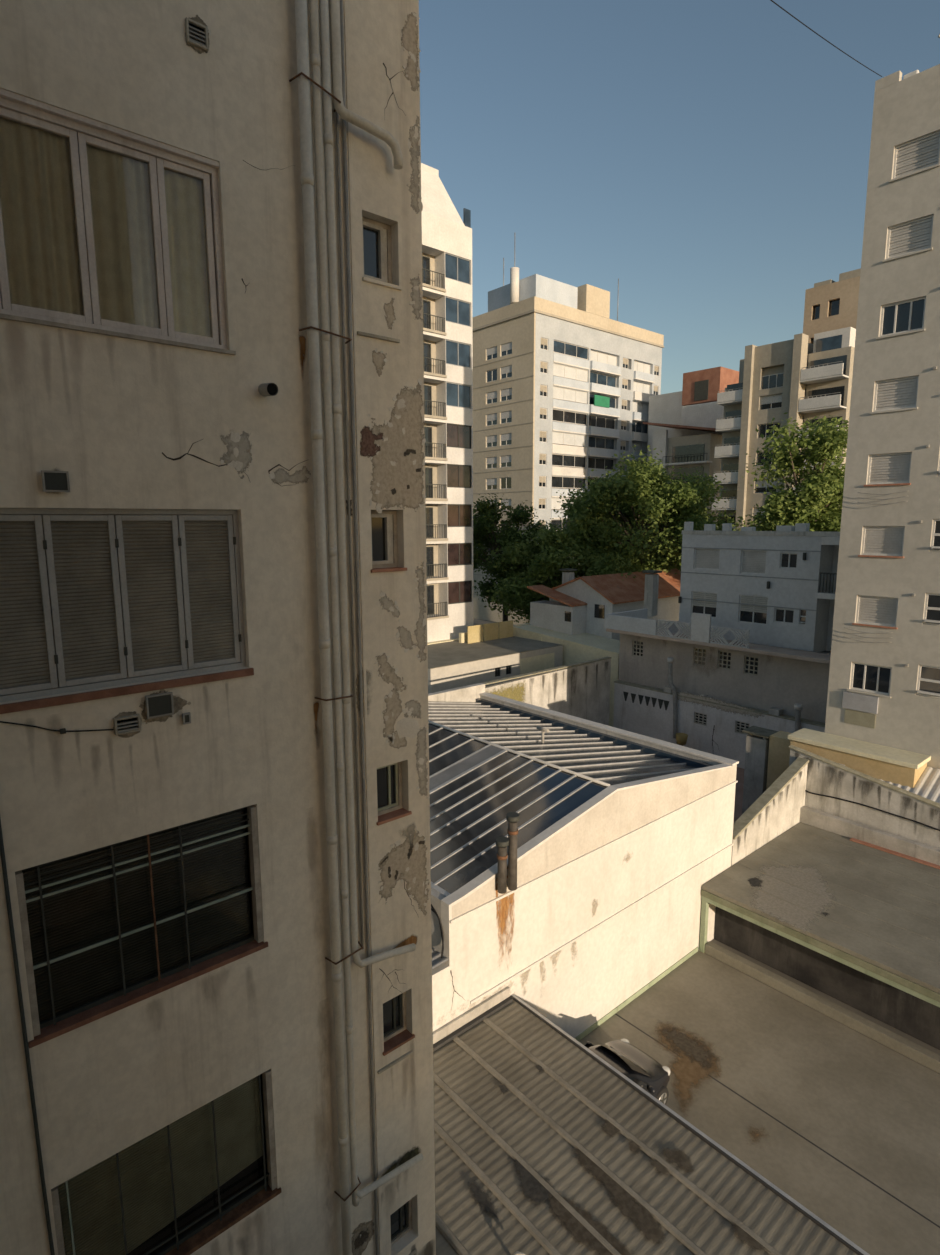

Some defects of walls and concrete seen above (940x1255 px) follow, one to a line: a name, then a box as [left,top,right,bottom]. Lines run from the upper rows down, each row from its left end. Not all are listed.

peeling [401,12,421,91]
crack [162,440,307,486]
spalling [360,378,426,513]
peeling [379,562,427,662]
peeling [375,653,430,799]
spalling [378,831,429,915]
rust [496,884,514,947]
leakage [515,1159,630,1255]
leakage [574,1149,664,1244]